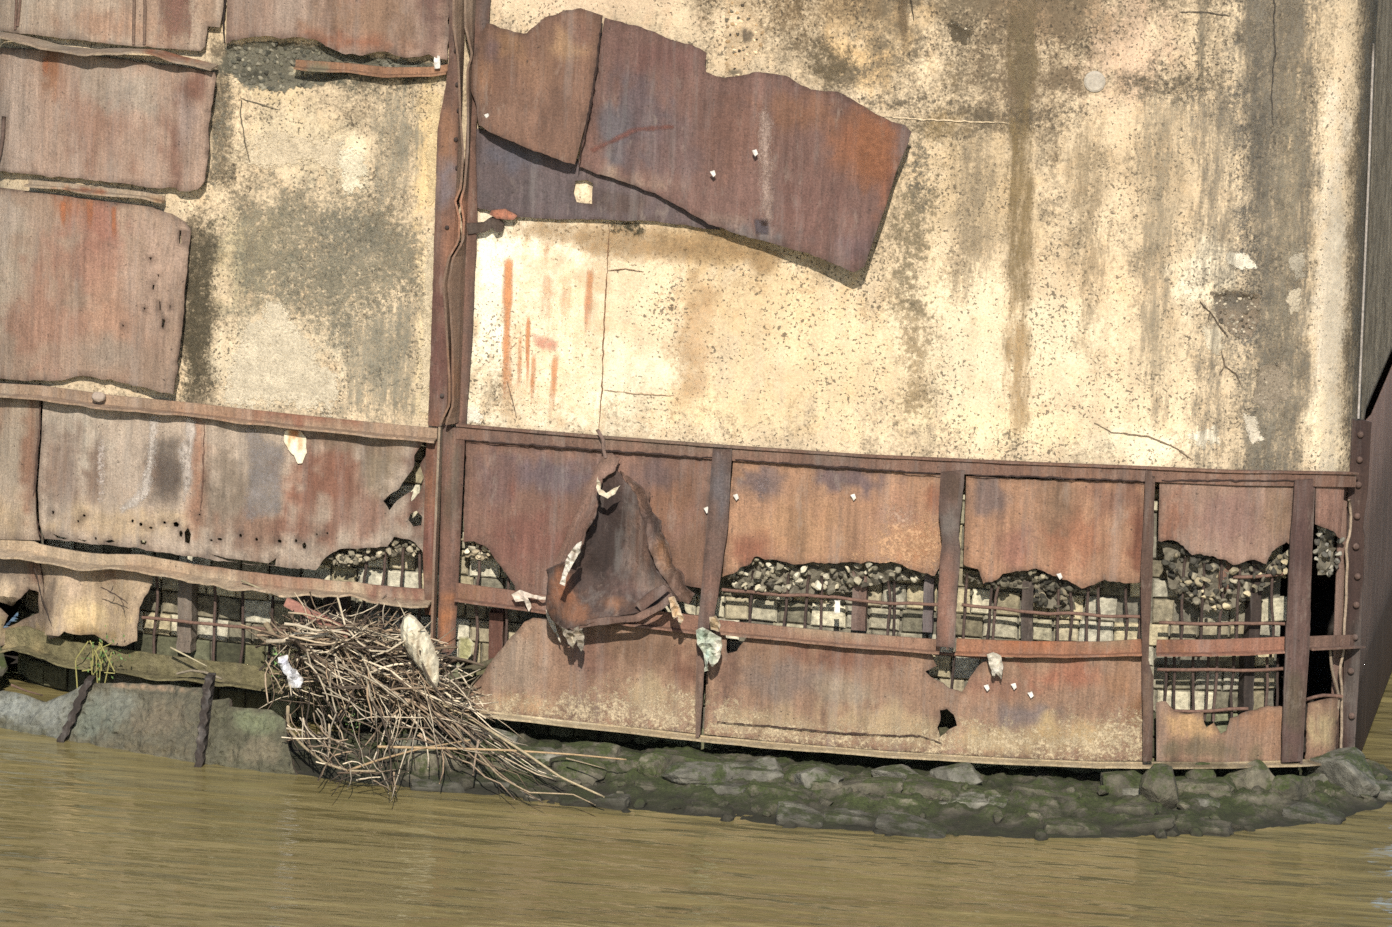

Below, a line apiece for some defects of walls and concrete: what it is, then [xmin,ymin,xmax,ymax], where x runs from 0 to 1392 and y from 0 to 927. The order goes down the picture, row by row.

water stain [809,42,855,83]
water stain [180,84,426,415]
water stain [859,10,1087,432]
water stain [1117,0,1321,471]
water stain [1329,0,1378,420]
corrosion [503,259,557,390]
spalling [326,538,423,568]
spalling [726,556,940,595]
corrosion [851,503,942,568]
spalling [963,569,1106,610]
spalling [1160,542,1290,612]
spalling [1313,525,1345,577]